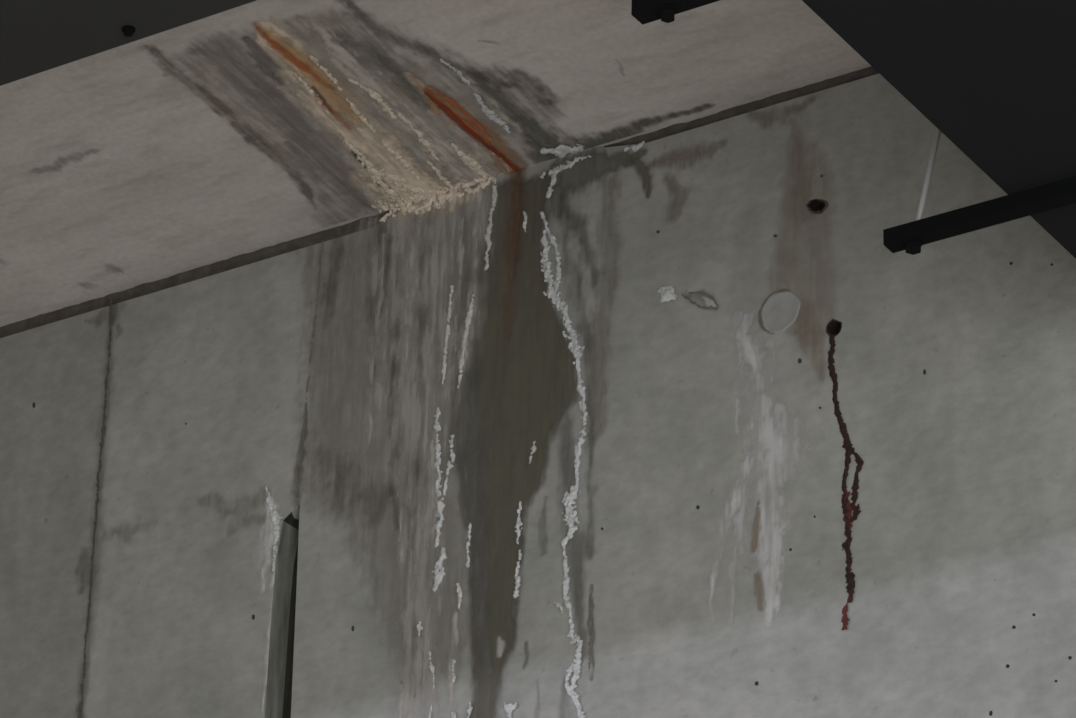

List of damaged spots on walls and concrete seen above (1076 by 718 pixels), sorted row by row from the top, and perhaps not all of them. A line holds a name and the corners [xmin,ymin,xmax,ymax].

water stain [197,86,286,158]
rust [254,23,334,90]
rust [423,85,522,280]
water stain [242,17,725,718]
water stain [709,311,807,625]
crack [828,334,864,631]